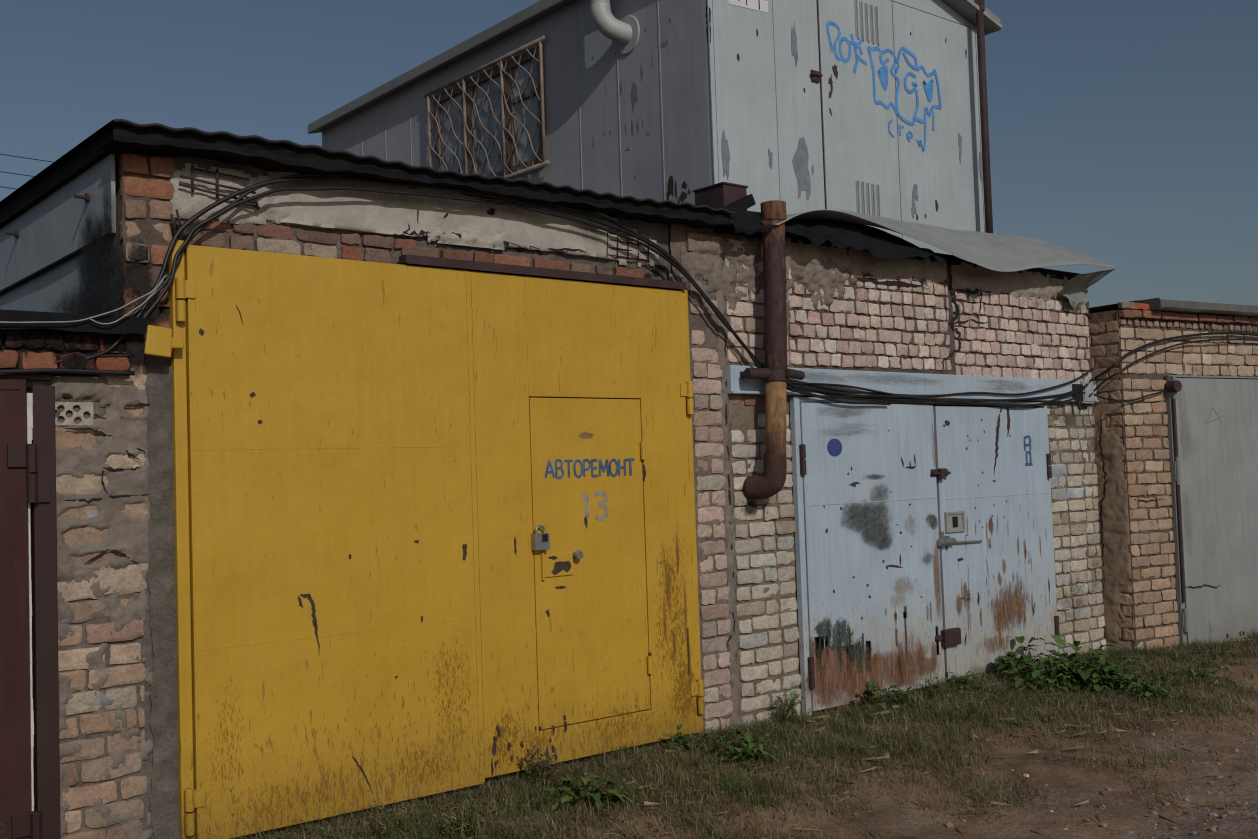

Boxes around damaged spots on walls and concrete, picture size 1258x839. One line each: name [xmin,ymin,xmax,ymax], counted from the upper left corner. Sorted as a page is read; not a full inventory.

spalling [428,227,505,250]
spalling [606,229,660,267]
peeling [667,175,691,203]
crack [857,270,987,374]
crack [1099,413,1161,597]
peeling [50,376,154,839]
rust [653,517,697,723]
rust [806,609,937,710]
rust [927,546,941,619]
rust [957,517,1041,651]
rust [206,630,476,832]
rust [485,700,657,778]